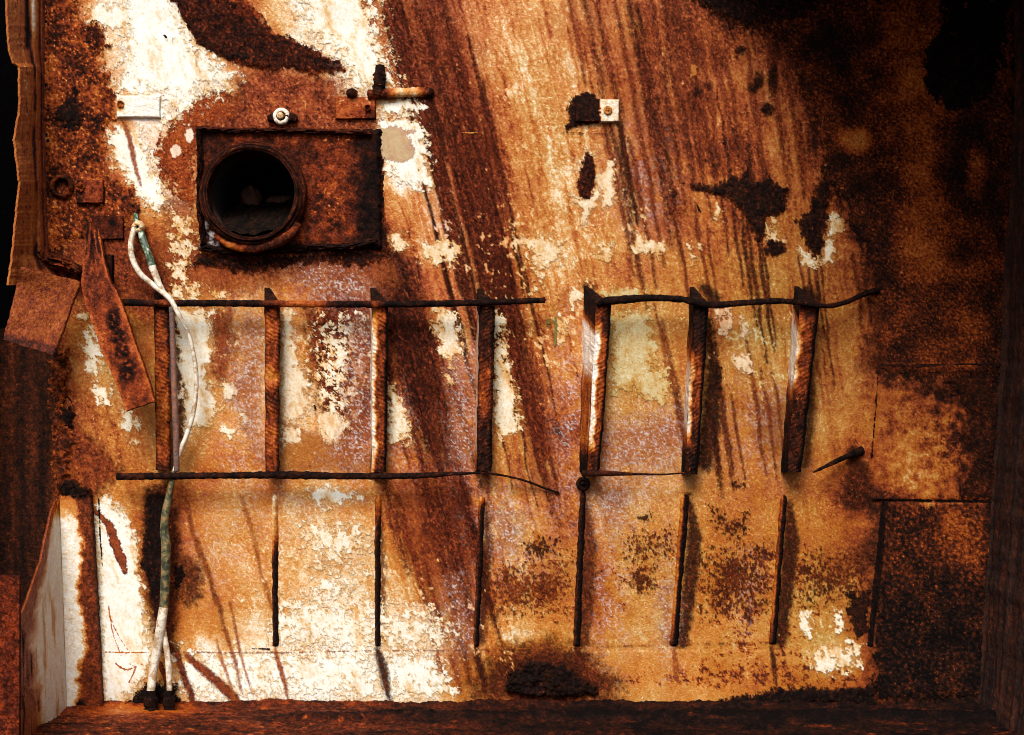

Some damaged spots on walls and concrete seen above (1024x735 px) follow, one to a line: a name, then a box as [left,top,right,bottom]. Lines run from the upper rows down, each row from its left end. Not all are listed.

peeling [76,0,437,448]
corrosion [44,0,624,704]
peeling [686,240,703,268]
corrosion [568,0,1015,706]
peeling [765,211,845,270]
peeling [94,494,151,701]
peeling [798,606,867,679]